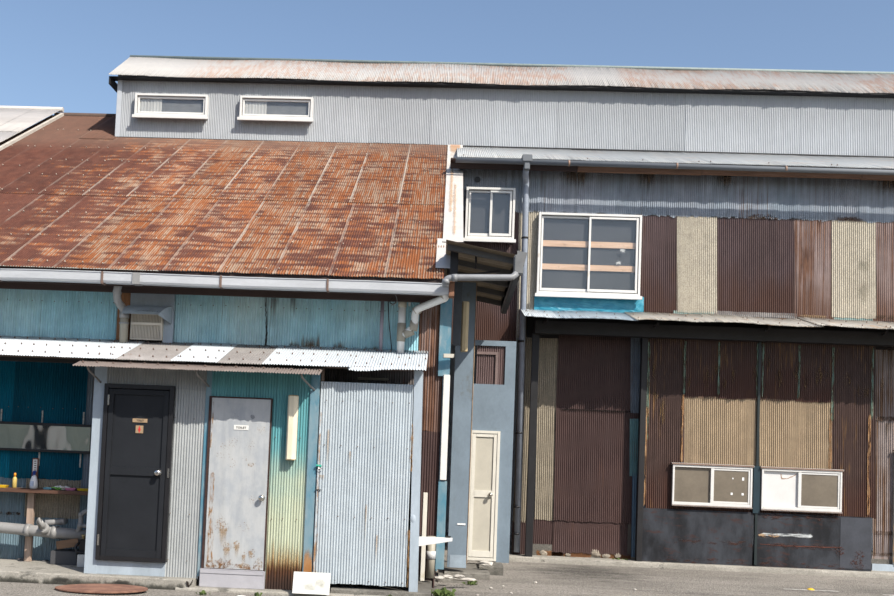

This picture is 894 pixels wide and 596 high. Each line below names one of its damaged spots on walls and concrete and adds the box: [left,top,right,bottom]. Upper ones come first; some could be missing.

crack [262,298,270,345]
rust [206,507,318,590]